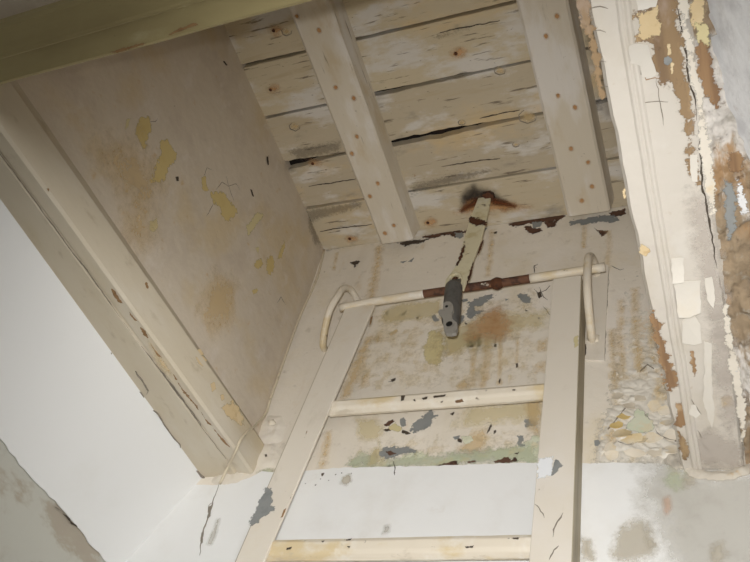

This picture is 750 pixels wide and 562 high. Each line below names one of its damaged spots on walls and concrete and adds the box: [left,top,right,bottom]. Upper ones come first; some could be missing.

crack [678,9,733,356]
corrosion [461,186,515,227]
flaking render [594,0,750,466]
peeling [460,294,494,324]
peeling [517,292,542,311]
peeling [350,446,428,474]
peeling [384,410,438,435]
peeling [480,435,540,463]
crack [736,395,745,464]
crack [196,471,219,553]